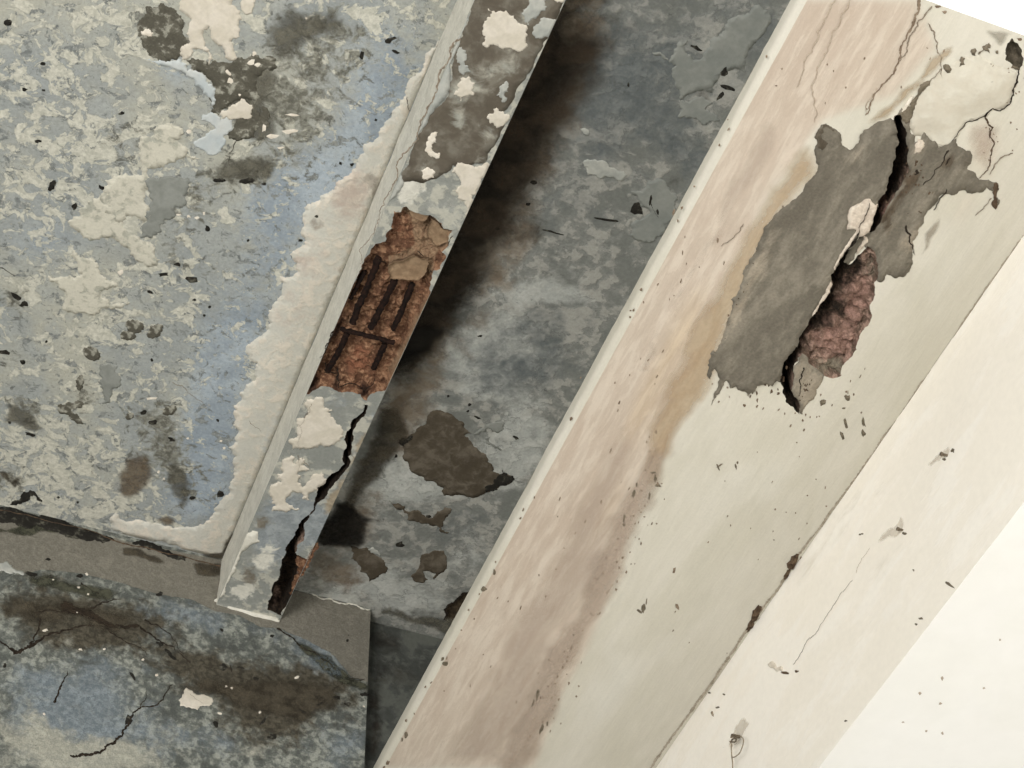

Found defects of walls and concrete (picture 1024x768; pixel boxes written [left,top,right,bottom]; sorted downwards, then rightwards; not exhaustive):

damp [272,13,339,58]
peeling [68,0,298,267]
crack [952,70,1019,216]
peeling [109,0,564,555]
flaking render [707,108,1000,414]
damp [346,410,407,508]
damp [5,576,129,631]
crack [0,582,189,662]
crack [267,405,368,689]
peeling [411,550,447,583]
crack [70,684,173,758]
damp [182,643,368,720]